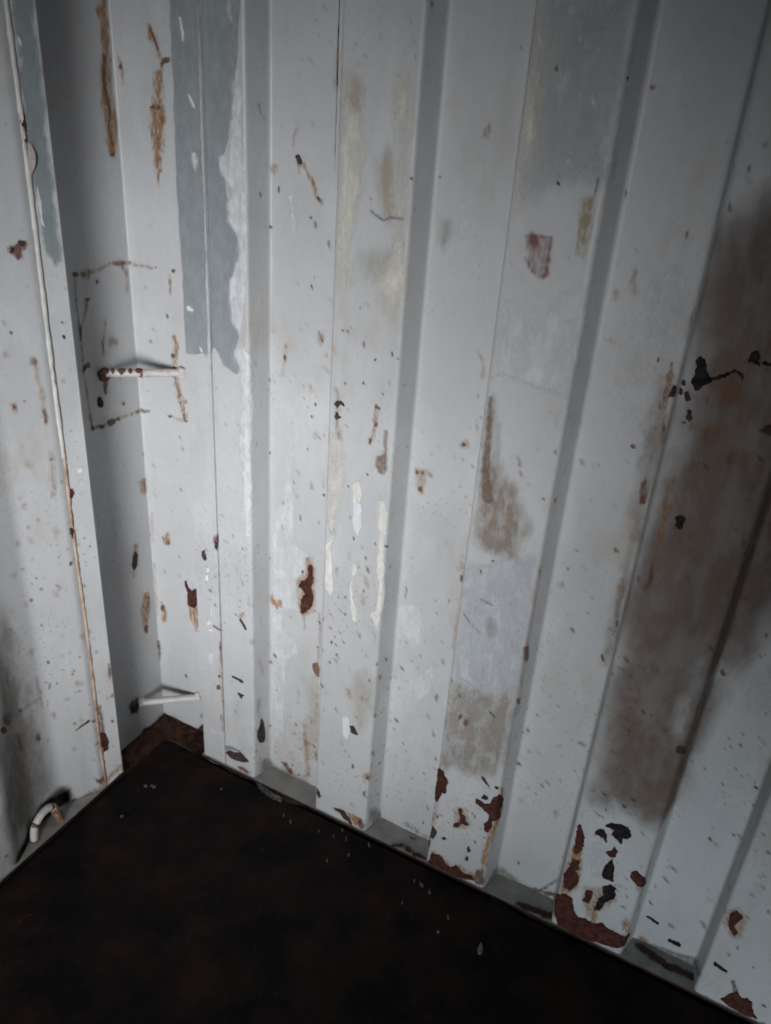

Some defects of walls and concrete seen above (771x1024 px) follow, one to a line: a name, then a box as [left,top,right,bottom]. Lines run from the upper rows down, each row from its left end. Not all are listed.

corrosion [96,0,123,156]
corrosion [148,25,170,181]
corrosion [86,367,148,430]
water stain [482,397,517,552]
water stain [605,209,771,820]
corrosion [391,836,474,881]
corrosion [515,893,694,981]
corrosion [630,869,652,909]
corrosion [726,910,743,949]
corrosion [721,981,766,1019]